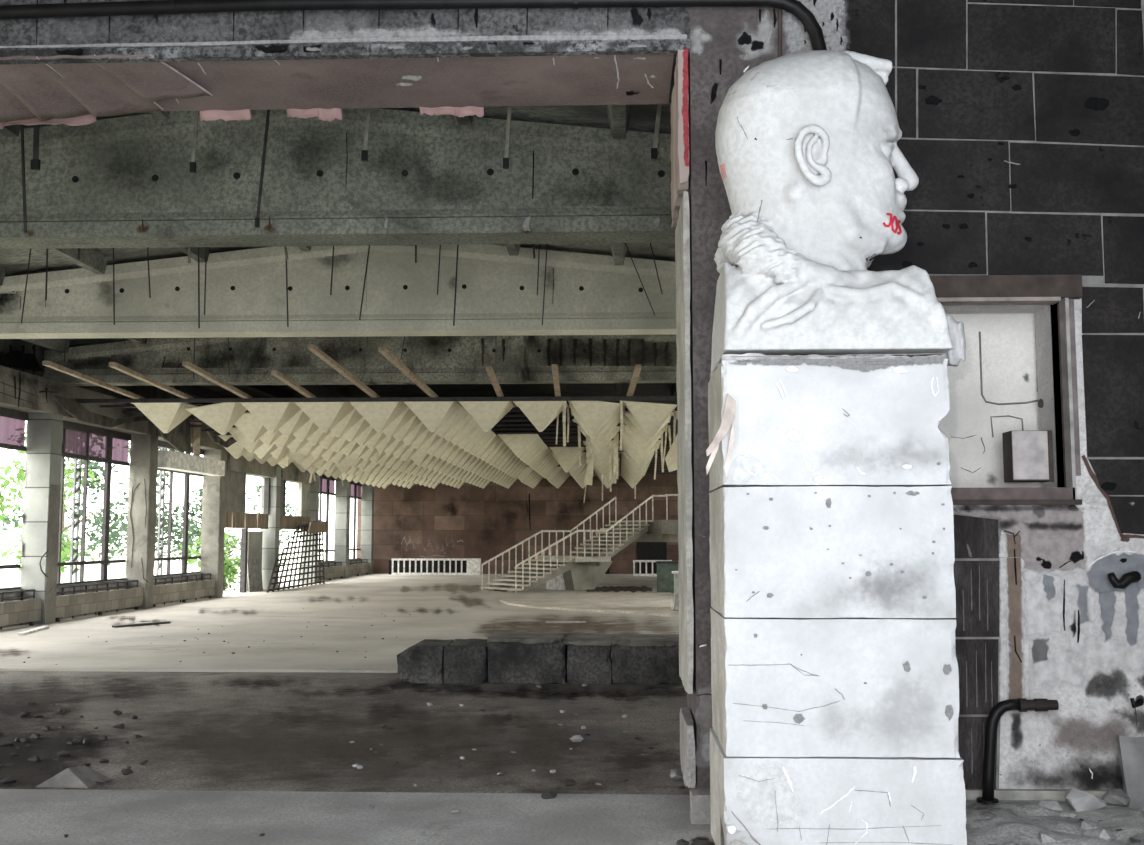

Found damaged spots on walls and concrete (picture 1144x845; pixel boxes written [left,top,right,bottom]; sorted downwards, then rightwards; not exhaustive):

flaking render [691,28,711,53]
flaking render [739,10,813,59]
flaking render [797,0,847,51]
spalling [1082,455,1144,542]
damp [1036,551,1144,645]
crack [731,664,845,726]
damp [1086,671,1144,698]
crack [731,775,952,845]